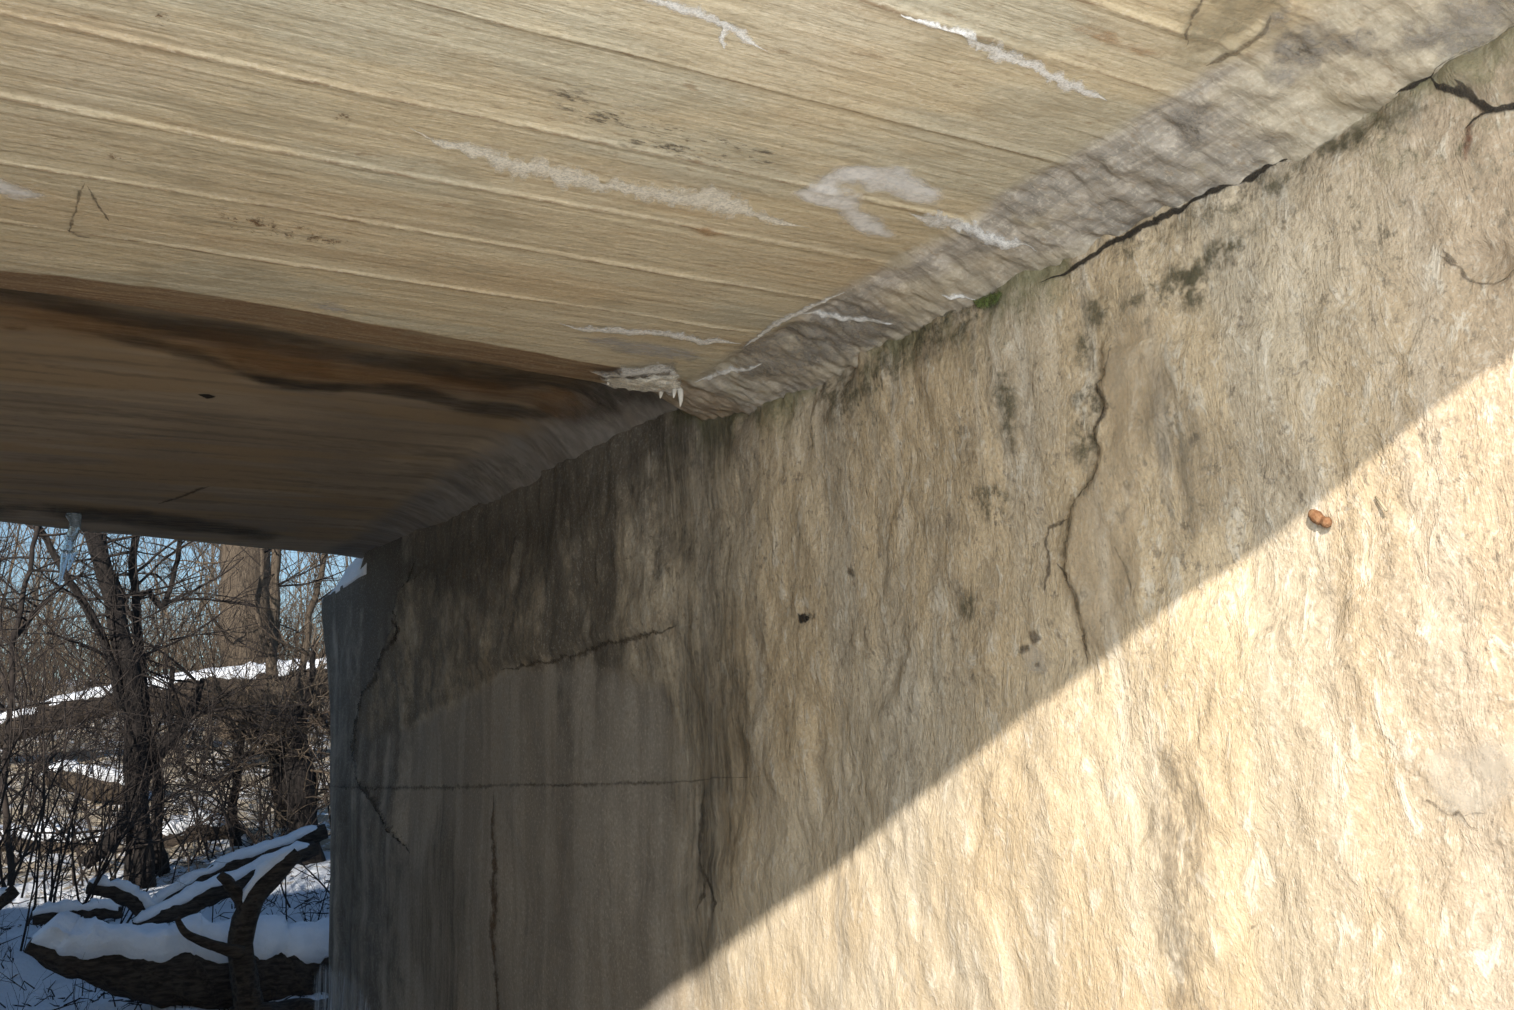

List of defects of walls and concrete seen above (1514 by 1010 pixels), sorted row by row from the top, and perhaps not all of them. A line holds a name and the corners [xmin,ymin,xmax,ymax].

leakage [648,0,768,52]
leakage [901,15,1107,101]
leakage [410,127,807,228]
leakage [797,167,1036,251]
crack [1039,159,1287,283]
crack [1442,249,1514,285]
leakage [562,292,892,359]
leakage [696,364,761,382]
crack [1044,349,1110,656]
crack [350,564,414,849]
crack [697,788,717,912]
crack [489,797,499,1010]